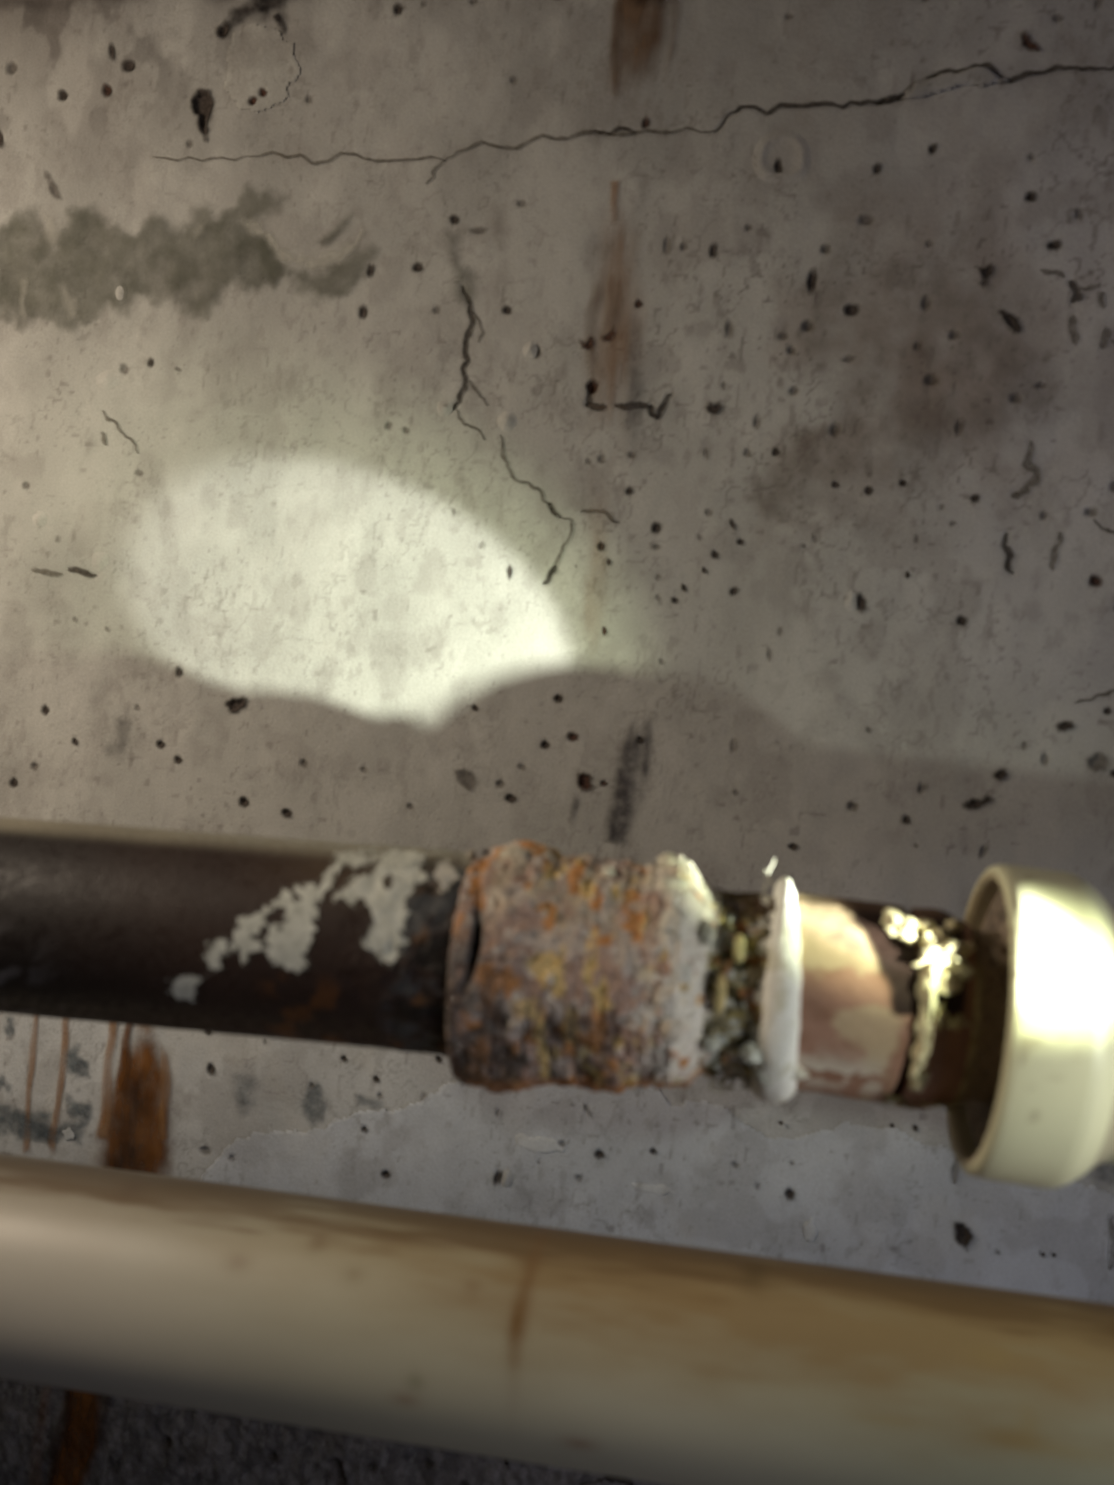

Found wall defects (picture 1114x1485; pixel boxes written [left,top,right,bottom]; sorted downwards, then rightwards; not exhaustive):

corrosion [613,0,662,68]
crack [155,63,1114,184]
water stain [0,196,356,316]
crack [453,286,619,585]
corrosion [49,1019,68,1145]
corrosion [98,1023,168,1175]
corrosion [50,1389,110,1485]